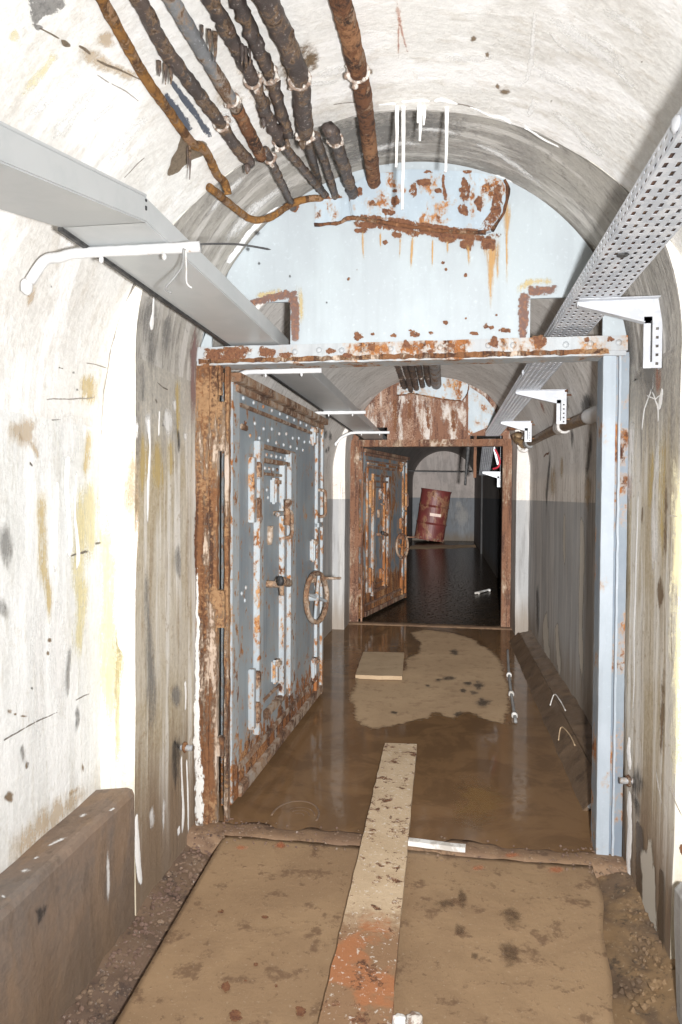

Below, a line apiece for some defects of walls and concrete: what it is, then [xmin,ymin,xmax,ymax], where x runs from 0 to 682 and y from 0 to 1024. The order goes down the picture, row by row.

corrosion [354,170,510,297]
leakage [144,297,170,361]
corrosion [190,275,614,410]
leakage [82,378,95,400]
corrosion [352,399,505,447]
leakage [0,530,11,560]
leakage [14,386,186,777]